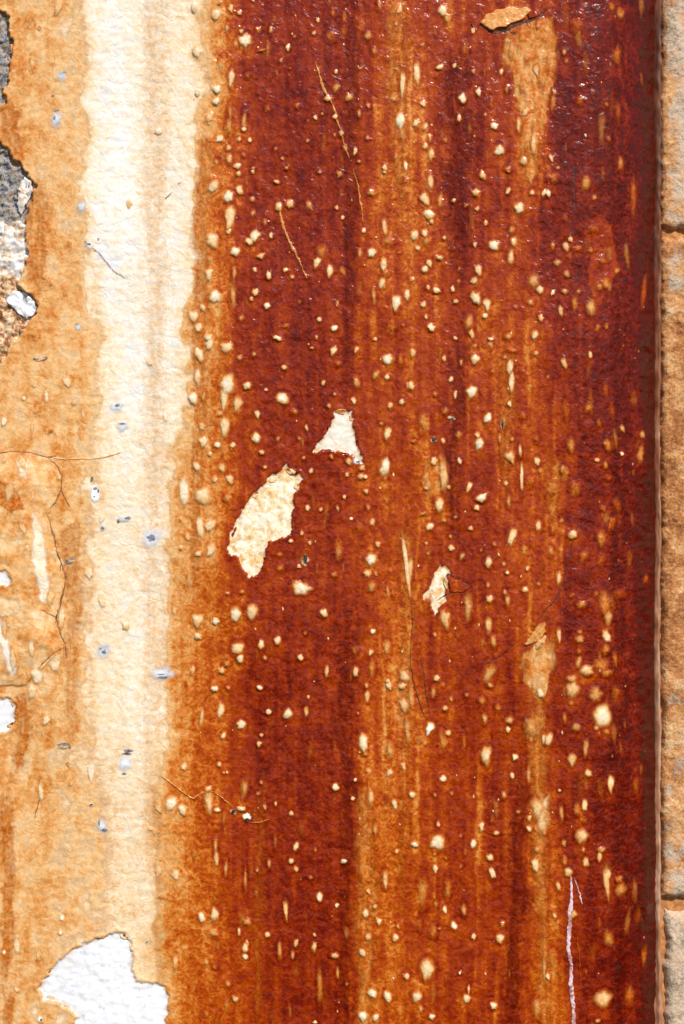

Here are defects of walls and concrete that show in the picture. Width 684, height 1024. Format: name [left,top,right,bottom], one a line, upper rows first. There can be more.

spalling [0,11,14,106]
peeling [471,0,550,32]
spalling [0,142,38,364]
peeling [313,409,363,464]
rust [0,0,110,1024]
crack [0,451,121,681]
peeling [227,463,303,578]
rust [148,0,656,1024]
peeling [422,565,471,615]
peeling [38,932,170,1024]